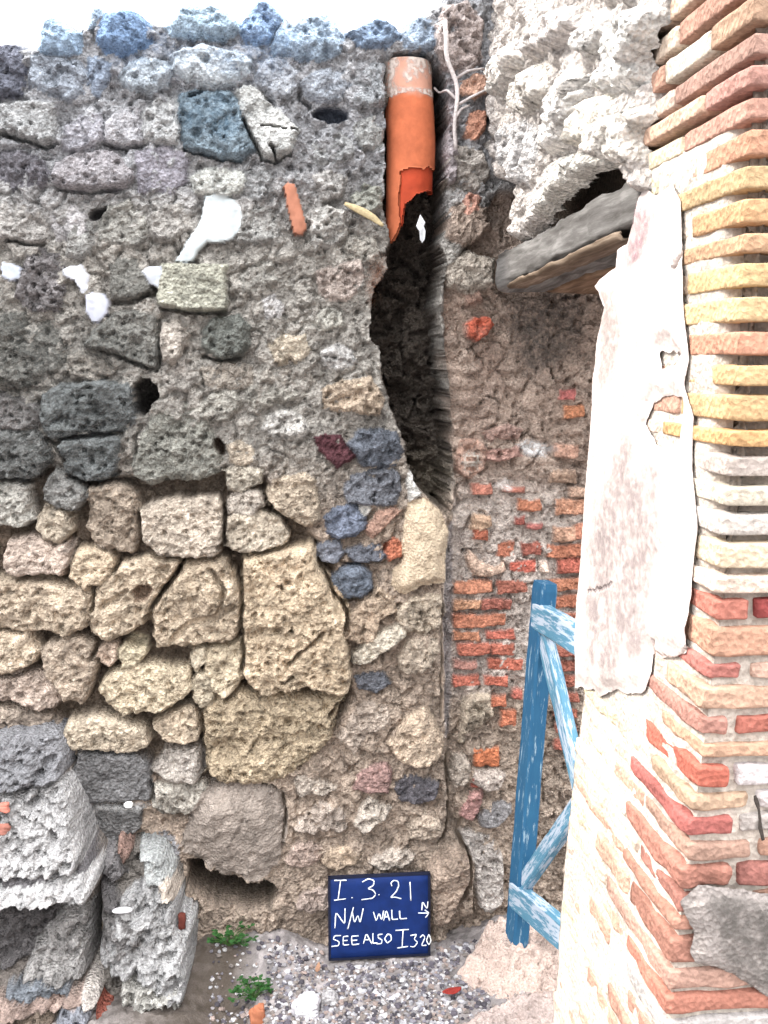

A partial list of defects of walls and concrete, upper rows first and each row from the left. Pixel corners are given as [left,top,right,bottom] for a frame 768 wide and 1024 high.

crack [262,122,298,130]
peeling [574,184,697,697]